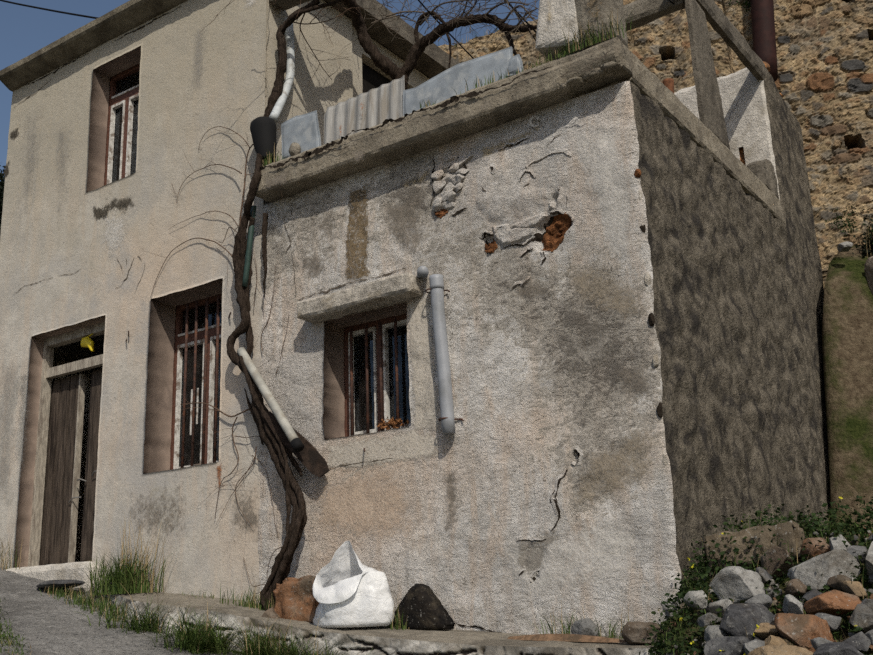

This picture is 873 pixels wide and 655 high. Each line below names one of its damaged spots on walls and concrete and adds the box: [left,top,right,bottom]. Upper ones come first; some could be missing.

crack [259,44,612,171]
leakage [345,186,370,279]
flaking render [430,153,473,218]
flaking render [480,187,575,254]
crack [516,468,568,542]
crack [518,568,540,582]